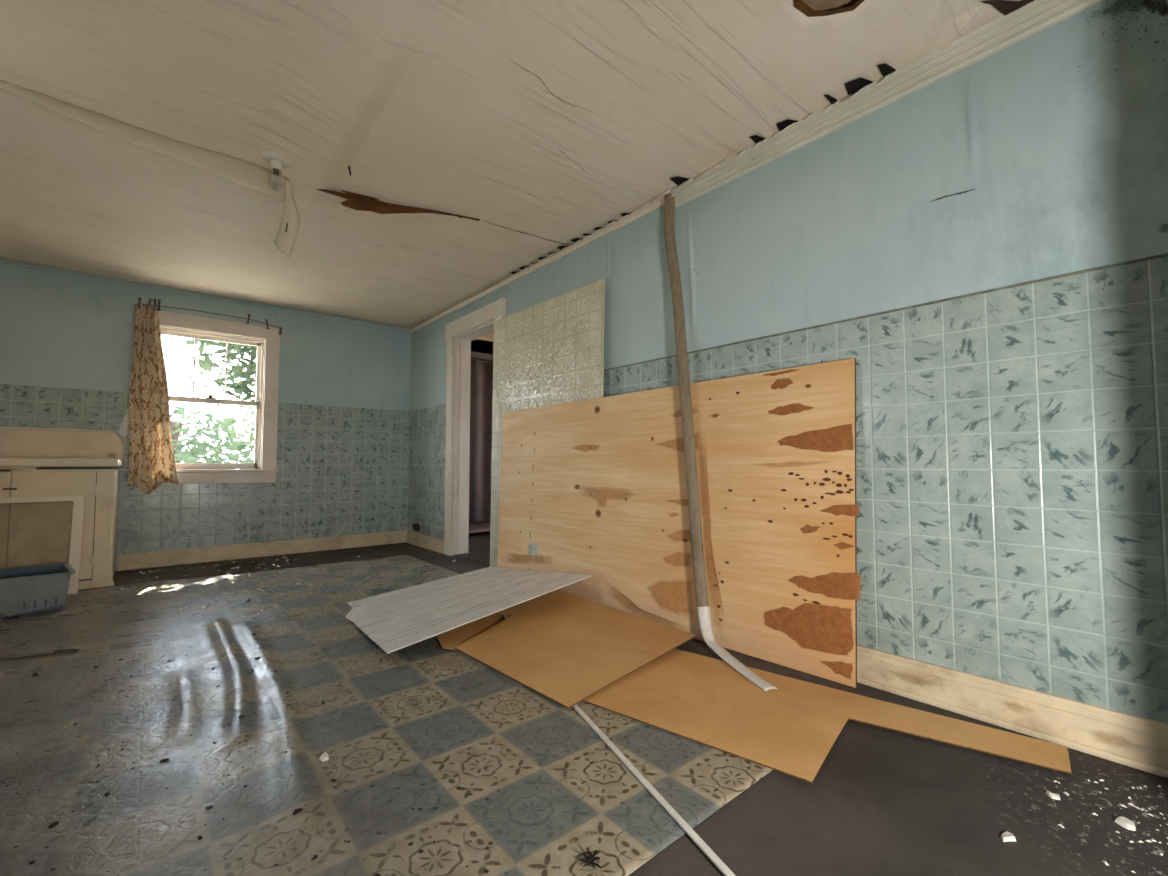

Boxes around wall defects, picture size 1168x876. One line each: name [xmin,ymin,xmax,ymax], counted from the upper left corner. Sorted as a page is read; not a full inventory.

peeling [794,0,864,17]
peeling [920,0,1034,53]
leakage [1086,0,1168,48]
peeling [0,80,300,258]
peeling [502,63,899,282]
peeling [316,189,480,221]